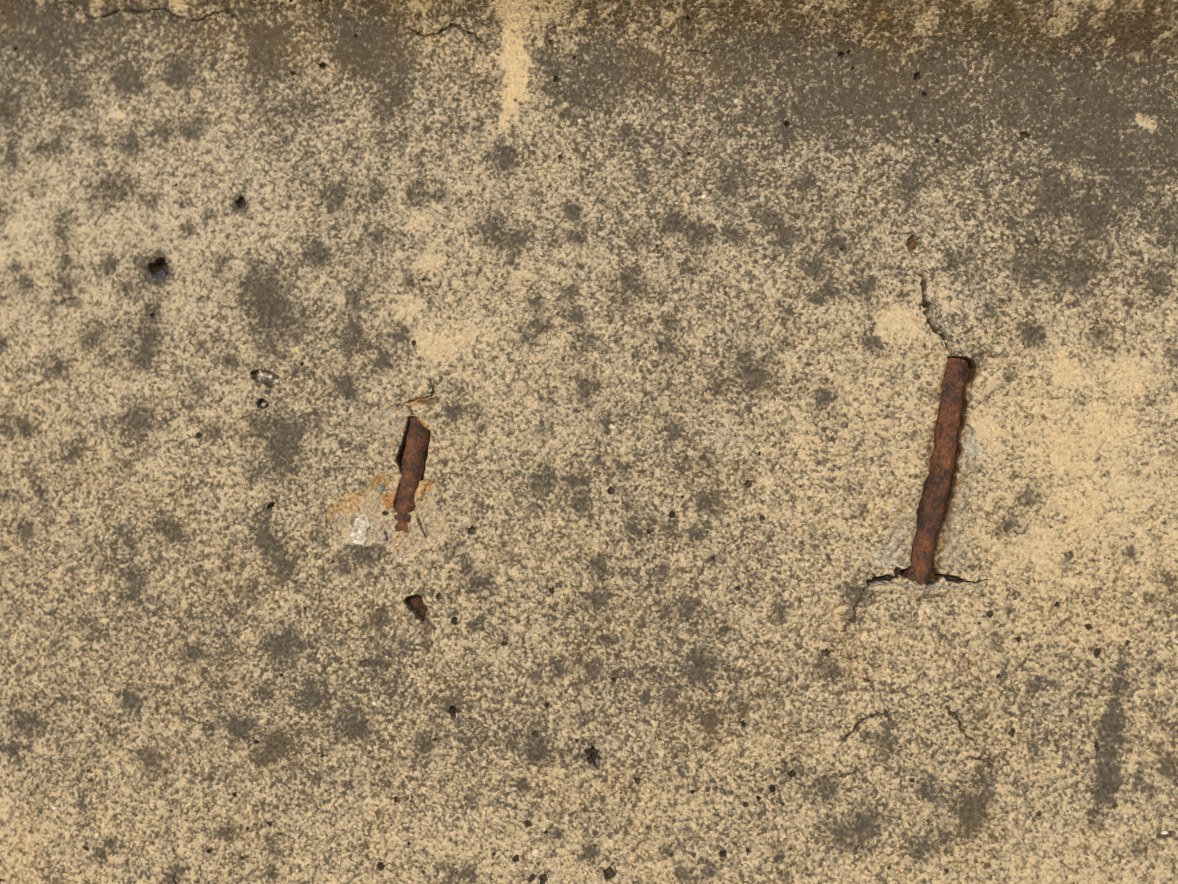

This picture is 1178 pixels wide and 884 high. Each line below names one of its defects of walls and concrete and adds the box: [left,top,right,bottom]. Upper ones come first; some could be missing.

spalling [326,375,456,566]
corrosion [394,417,431,533]
spalling [869,353,989,583]
corrosion [903,358,968,586]